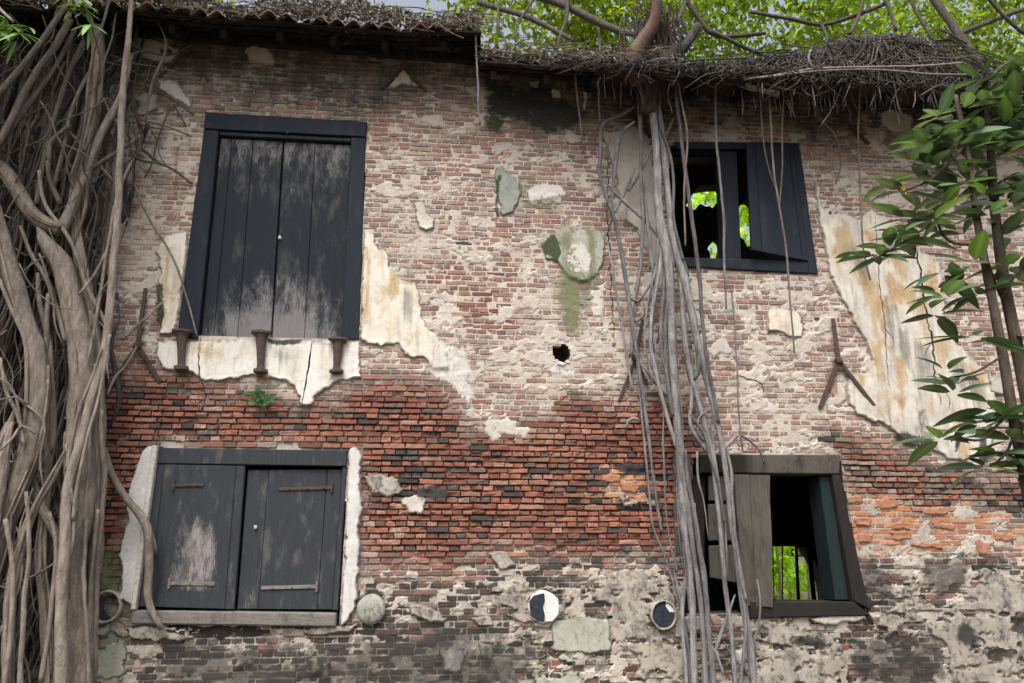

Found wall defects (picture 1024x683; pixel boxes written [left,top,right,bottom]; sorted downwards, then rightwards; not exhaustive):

water stain [483,80,587,134]
peeling [494,165,566,217]
peeling [155,230,477,409]
crack [875,217,894,386]
crack [302,343,312,402]
spalling [550,344,575,377]
spalling [605,474,649,505]
spalling [489,551,516,570]
spalling [409,604,447,623]
spalling [471,567,700,683]
spalling [735,568,1024,683]
spalling [440,646,463,673]